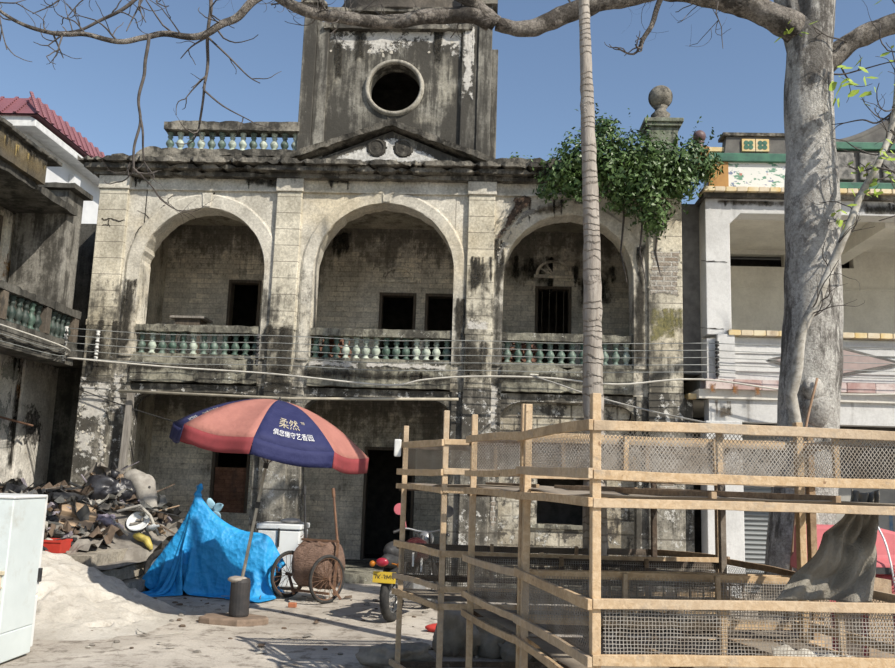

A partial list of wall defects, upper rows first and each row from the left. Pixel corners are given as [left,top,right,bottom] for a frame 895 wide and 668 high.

peeling [330,24,475,99]
leakage [331,233,351,257]
leakage [469,239,553,298]
leakage [572,266,584,304]
leakage [601,266,615,303]
leakage [265,324,293,389]
leakage [301,298,498,384]
leakage [497,372,583,384]
leakage [7,358,21,469]